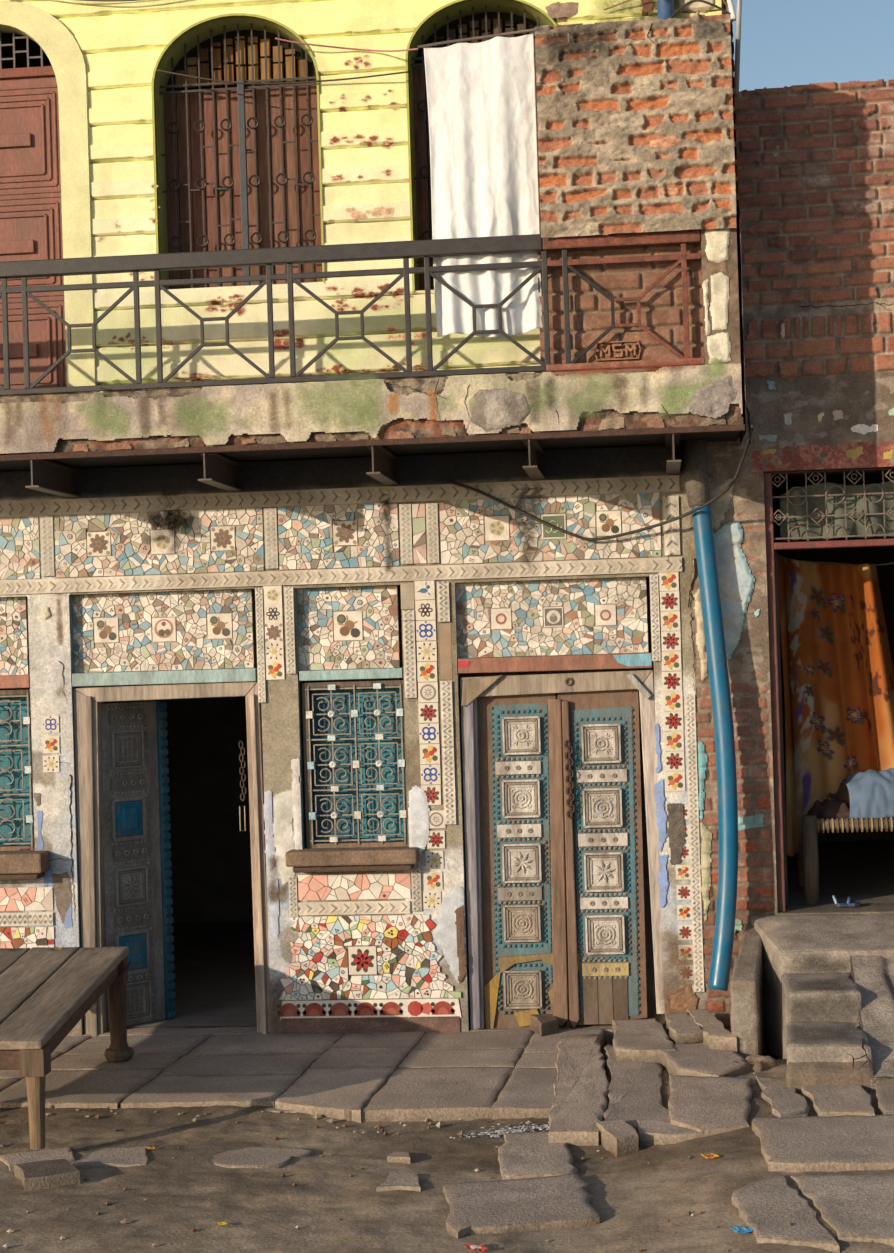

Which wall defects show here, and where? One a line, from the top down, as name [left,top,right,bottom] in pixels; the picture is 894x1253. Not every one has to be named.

peeling [328,134,397,150]
peeling [326,283,414,312]
spalling [578,228,743,431]
spalling [296,362,452,396]
spalling [57,435,204,453]
spalling [229,433,286,445]
spalling [310,418,467,442]
peeling [818,410,878,461]
flaking render [714,521,760,660]
peeling [408,785,430,854]
peeling [263,758,302,938]
peeling [434,886,467,984]